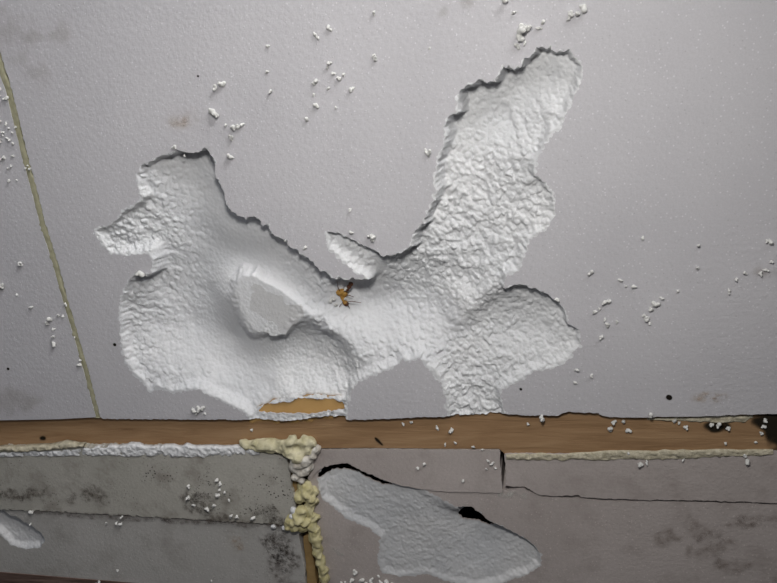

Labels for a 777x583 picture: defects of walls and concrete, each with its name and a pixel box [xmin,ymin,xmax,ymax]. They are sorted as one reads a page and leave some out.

spalling [93,45,583,423]